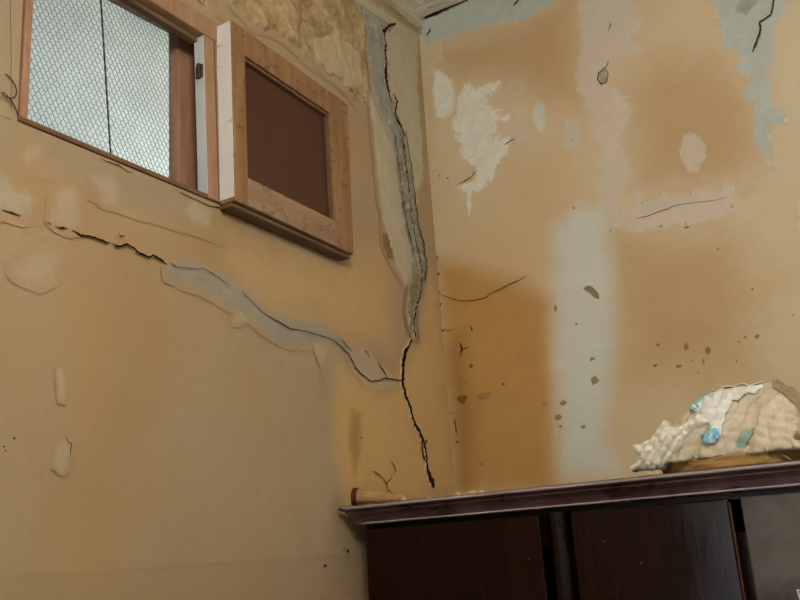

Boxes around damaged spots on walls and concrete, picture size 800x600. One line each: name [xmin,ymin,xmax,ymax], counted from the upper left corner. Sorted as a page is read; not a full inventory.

crack [47,222,230,286]
flaking render [186,0,428,343]
crack [247,22,525,489]
peeling [419,0,743,243]
peeling [702,0,800,182]
crack [752,0,775,53]
peeling [341,344,399,394]